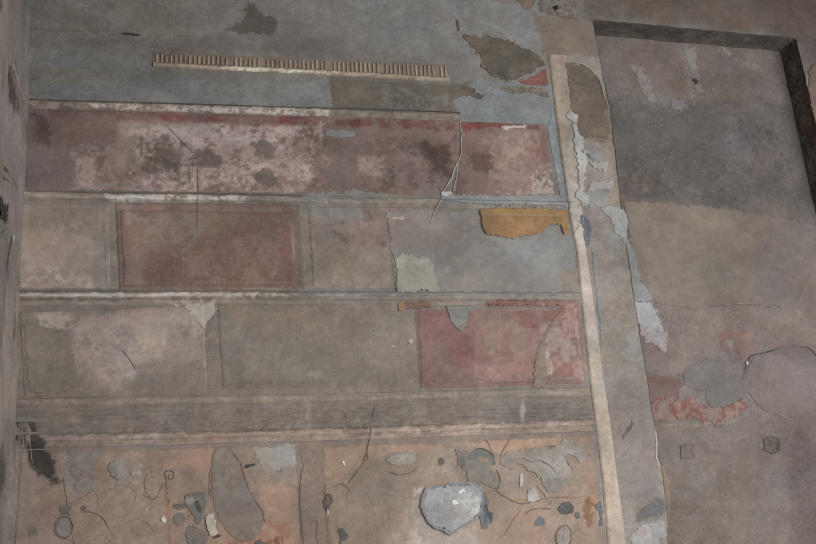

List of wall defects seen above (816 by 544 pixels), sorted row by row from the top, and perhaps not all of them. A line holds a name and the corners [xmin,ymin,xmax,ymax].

flaking render [456,19,550,98]
flaking render [565,61,609,138]
flaking render [580,215,592,248]
water stain [16,421,46,448]
crack [349,409,375,482]
spalling [161,470,221,544]
flaking render [420,439,586,535]